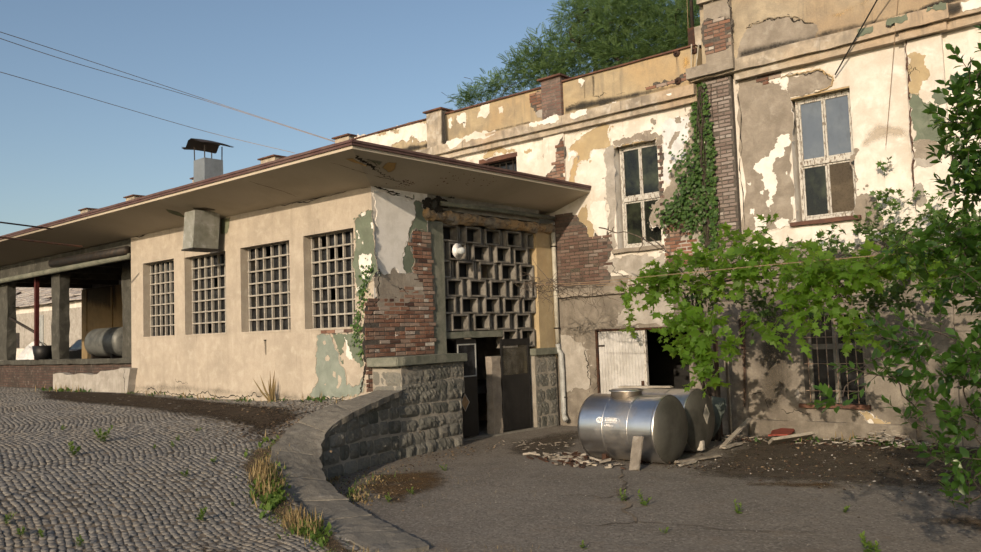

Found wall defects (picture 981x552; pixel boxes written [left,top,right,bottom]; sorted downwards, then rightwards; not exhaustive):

flaking render [701,14,818,58]
crack [250,155,413,210]
peeling [446,104,532,160]
peeling [529,91,587,127]
flaking render [546,106,707,329]
flaking render [736,68,834,246]
peeling [907,52,948,169]
flaking render [309,172,457,399]